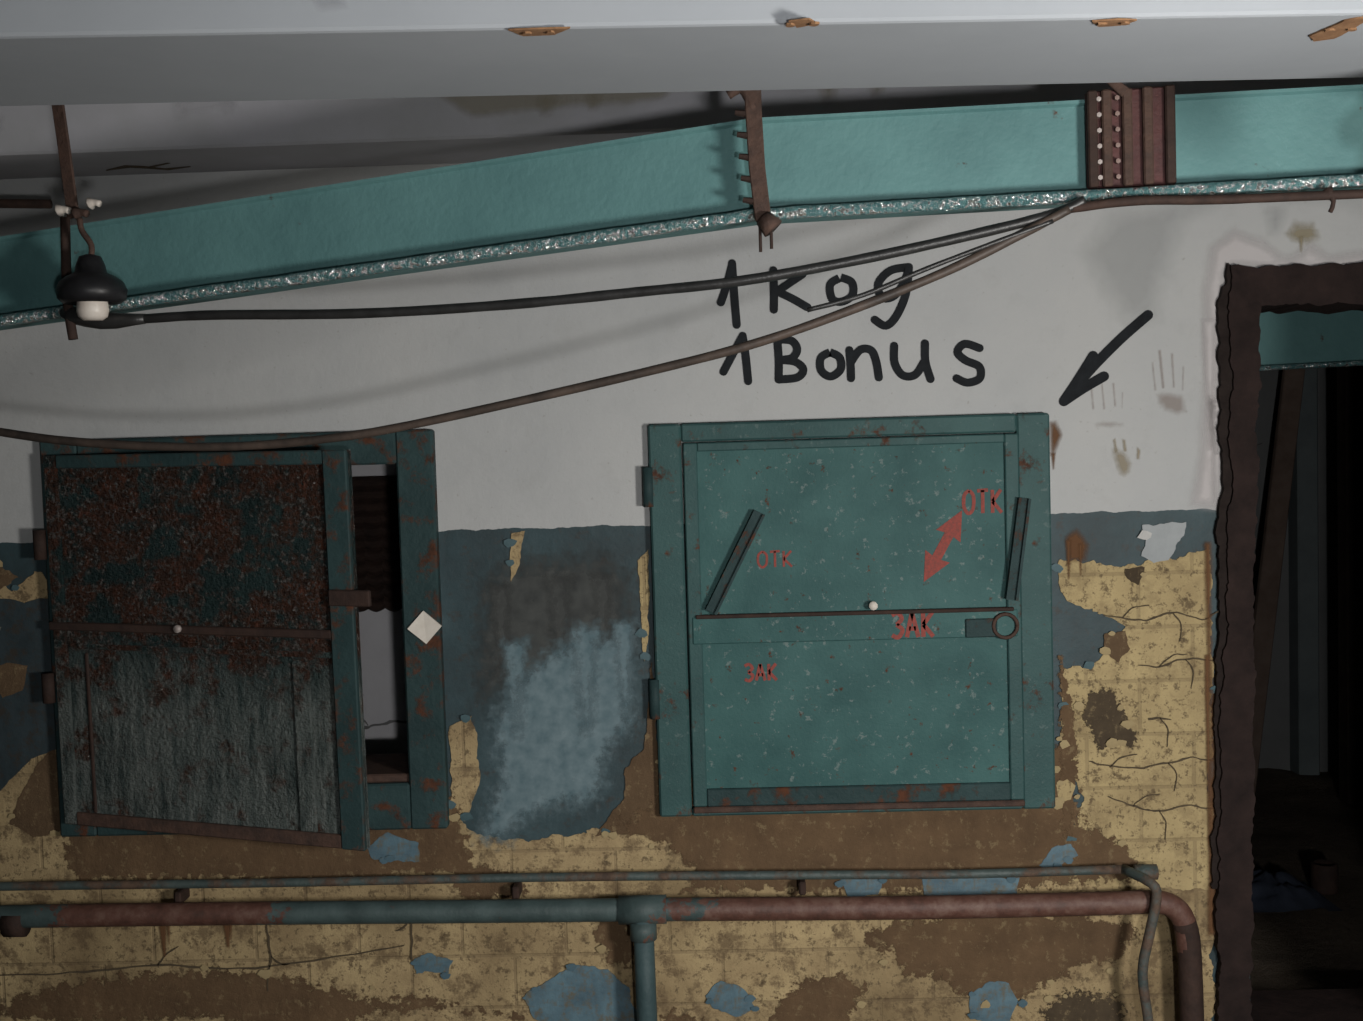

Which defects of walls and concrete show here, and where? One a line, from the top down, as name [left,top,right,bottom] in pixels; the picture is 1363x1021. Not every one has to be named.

peeling [504,531,525,580]
crack [1104,605,1219,689]
spalling [0,550,1216,1021]
crack [1089,717,1214,840]